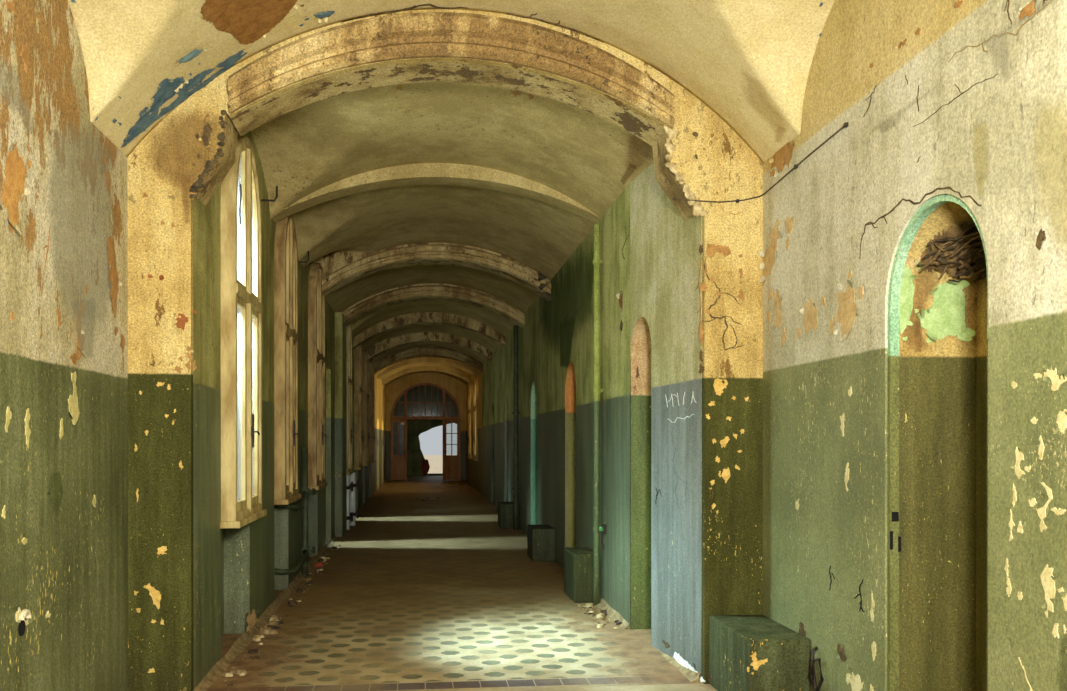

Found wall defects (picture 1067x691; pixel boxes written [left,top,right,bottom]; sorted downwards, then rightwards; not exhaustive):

peeling [112,0,335,150]
crack [905,0,1052,126]
peeling [0,141,32,235]
spalling [189,110,227,200]
crack [859,186,981,259]
crack [695,257,744,350]
peeling [5,406,31,449]
peeling [709,429,744,489]
peeling [1008,417,1066,541]
peeling [1033,365,1067,391]
peeling [1053,409,1067,437]
peeling [1040,564,1067,638]